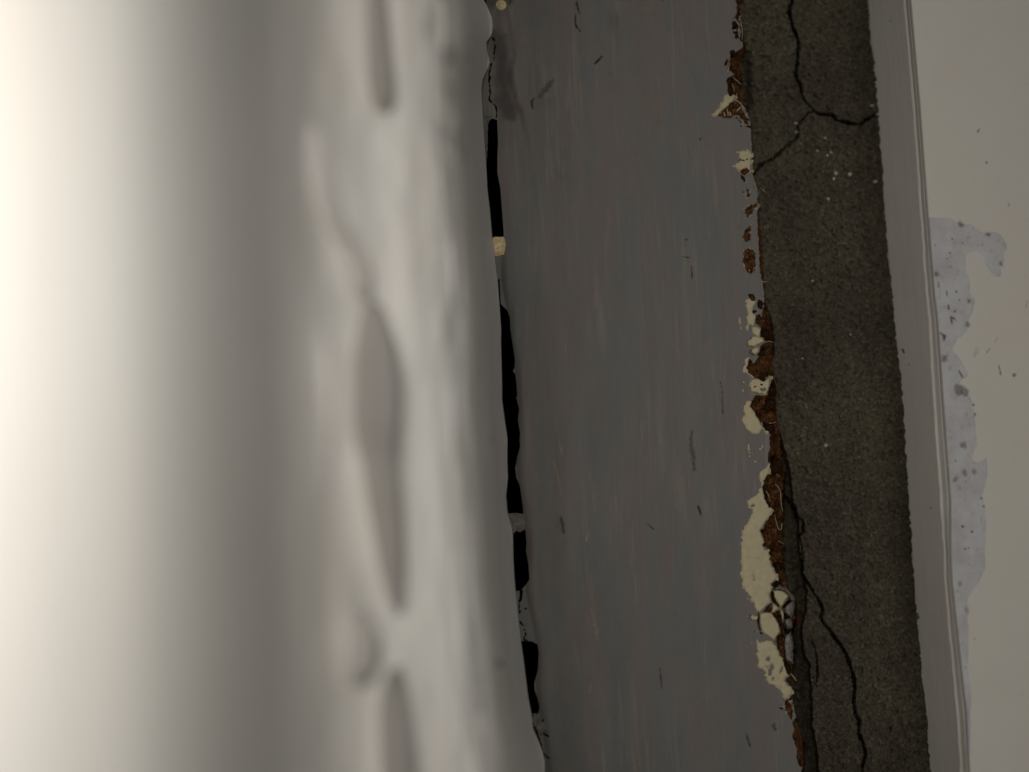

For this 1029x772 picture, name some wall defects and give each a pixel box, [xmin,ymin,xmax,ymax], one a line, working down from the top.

crack [754,0,876,175]
peeling [711,0,804,772]
crack [782,491,867,772]